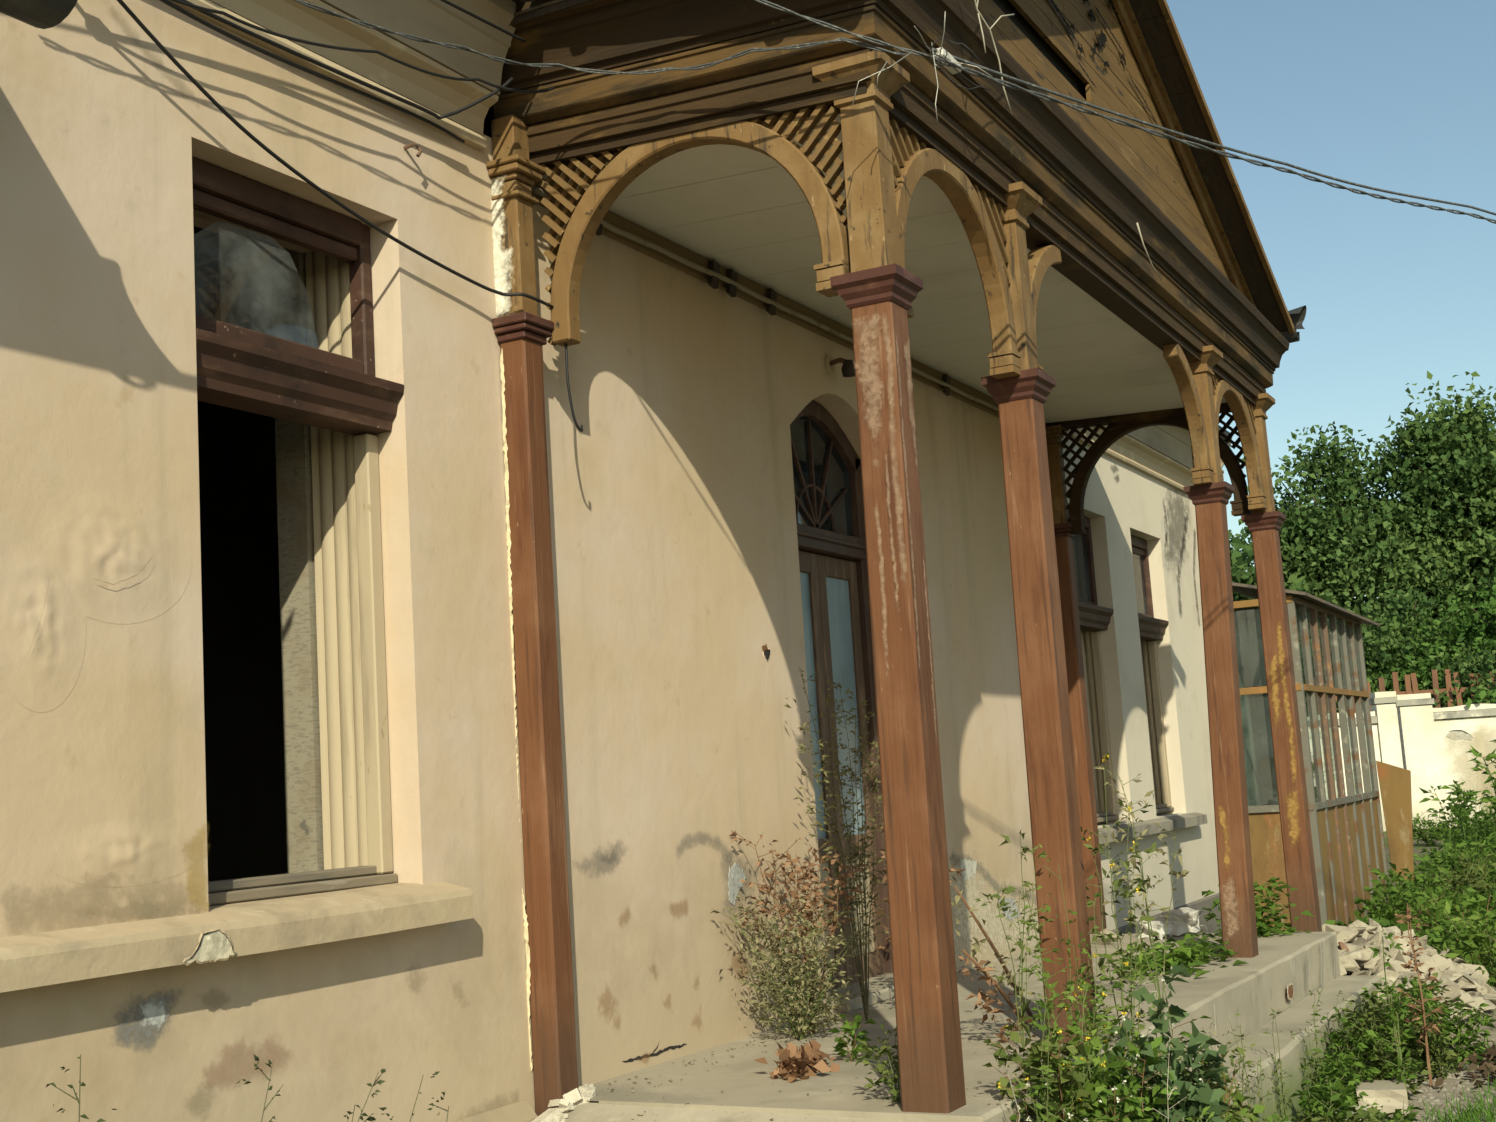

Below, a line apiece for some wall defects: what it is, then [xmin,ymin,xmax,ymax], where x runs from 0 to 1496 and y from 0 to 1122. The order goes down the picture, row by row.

peeling [491,181,512,314]
peeling [728,863,747,905]
peeling [117,994,175,1047]